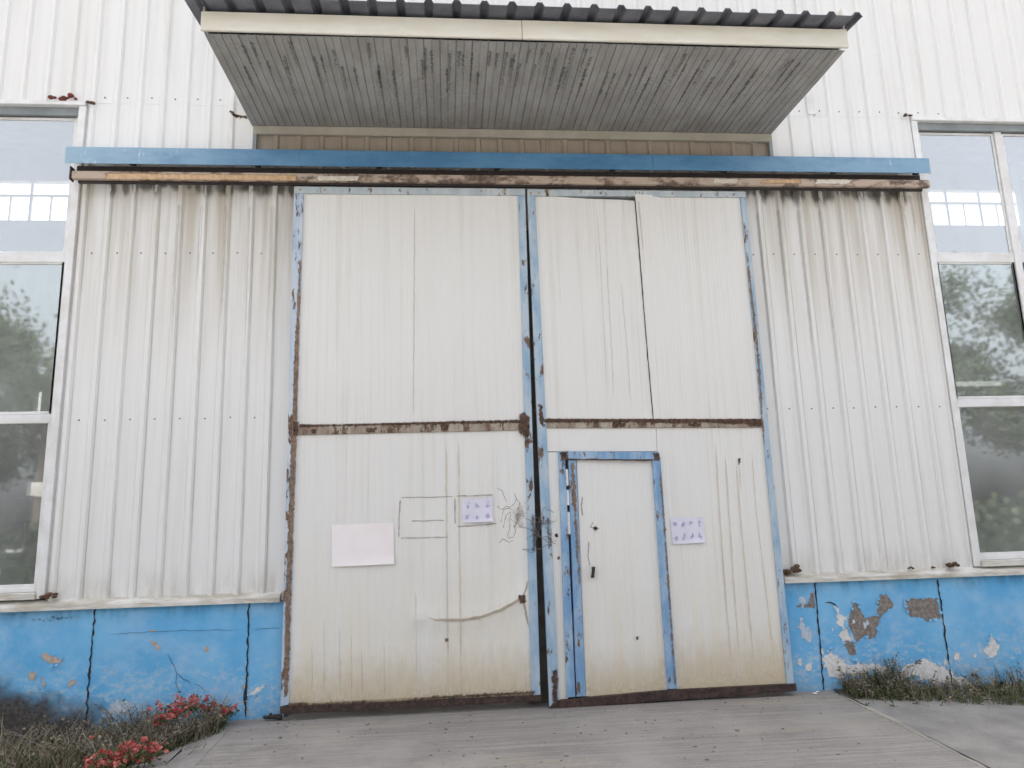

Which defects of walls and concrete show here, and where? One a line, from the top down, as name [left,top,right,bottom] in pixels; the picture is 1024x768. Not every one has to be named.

corrosion [105,173,297,181]
damp [753,190,905,201]
corrosion [283,257,765,707]
peeling [28,653,63,686]
crack [85,609,219,731]
crack [243,603,271,717]
crack [814,583,838,690]
flaking render [796,592,971,688]
crack [937,579,953,685]
peeling [974,634,1001,659]